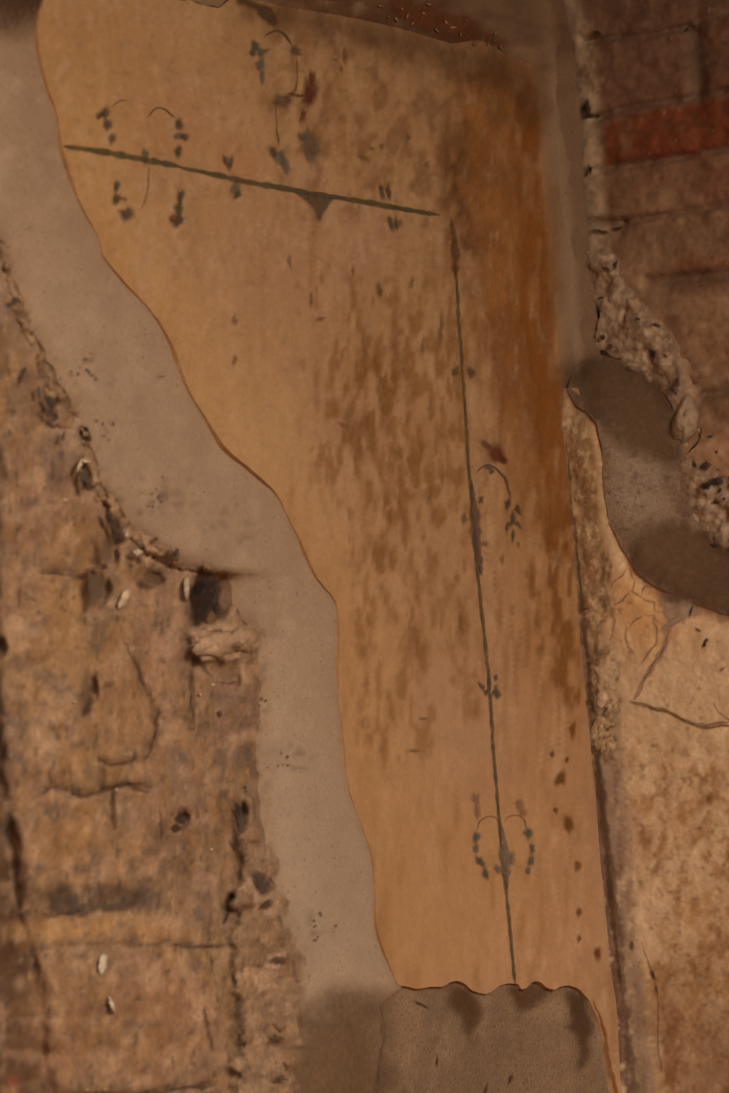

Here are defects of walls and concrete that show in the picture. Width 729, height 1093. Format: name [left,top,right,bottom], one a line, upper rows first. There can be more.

spalling [583,100,600,118]
spalling [0,239,231,626]
flaking render [569,416,609,637]
flaking render [587,249,729,550]
spalling [41,886,145,916]
spalling [172,813,190,831]
spalling [224,805,303,1093]
flaking render [592,647,623,756]
crack [566,440,729,1087]